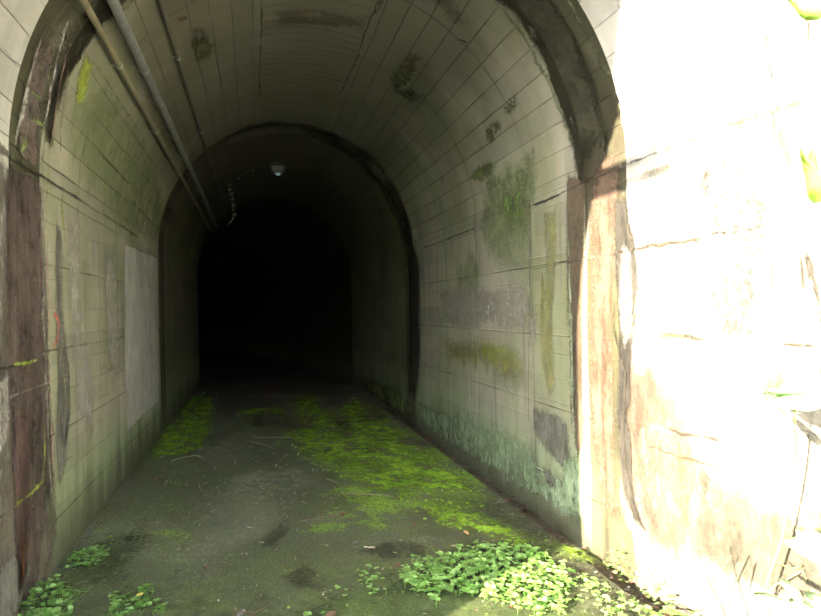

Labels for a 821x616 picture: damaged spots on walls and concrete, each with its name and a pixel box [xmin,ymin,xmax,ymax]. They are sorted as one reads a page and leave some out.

leakage [0,163,94,616]
leakage [14,0,113,165]
leakage [228,122,420,395]
crack [340,0,384,93]
leakage [472,163,492,180]
leakage [486,122,501,142]
leakage [501,0,609,466]
crack [486,115,821,532]
leakage [621,110,821,616]
leakage [362,541,426,558]
leakage [468,495,626,610]